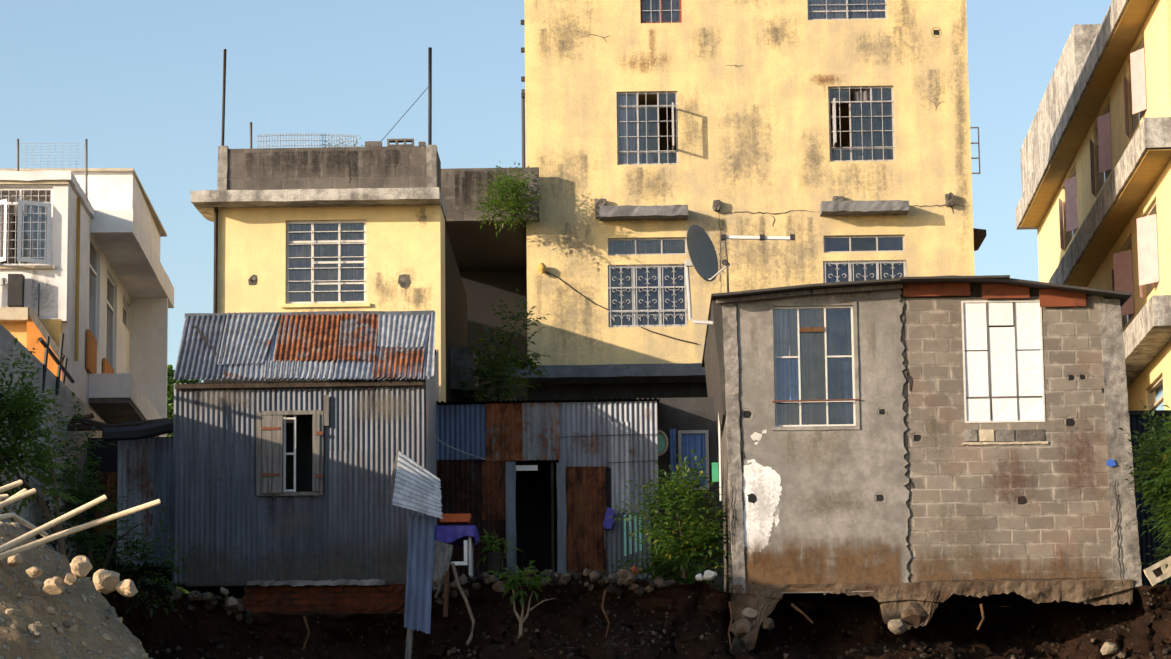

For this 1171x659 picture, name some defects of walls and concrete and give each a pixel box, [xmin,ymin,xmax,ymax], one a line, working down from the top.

water stain [286,150,397,171]
peeling [742,408,767,445]
crack [903,299,1123,601]
peeling [742,459,782,552]